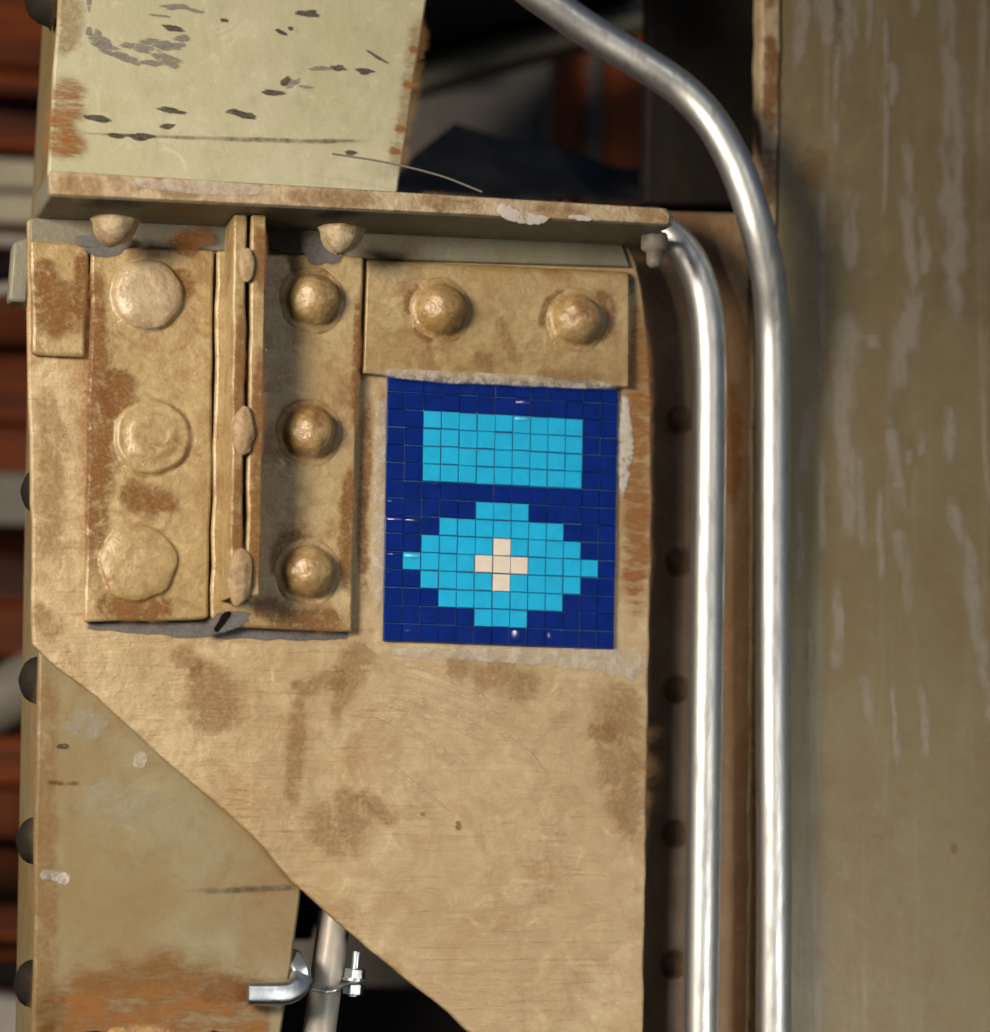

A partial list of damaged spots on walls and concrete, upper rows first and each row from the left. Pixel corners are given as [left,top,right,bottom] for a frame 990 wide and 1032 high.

corrosion [47,82,82,156]
peeling [84,106,186,141]
peeling [85,3,204,68]
peeling [226,109,255,119]
peeling [262,76,313,96]
peeling [309,50,389,75]
leakage [794,0,898,210]
leakage [939,0,967,313]
leakage [891,145,931,387]
leakage [818,192,912,612]
leakage [948,502,990,721]
corrosion [39,958,269,1032]